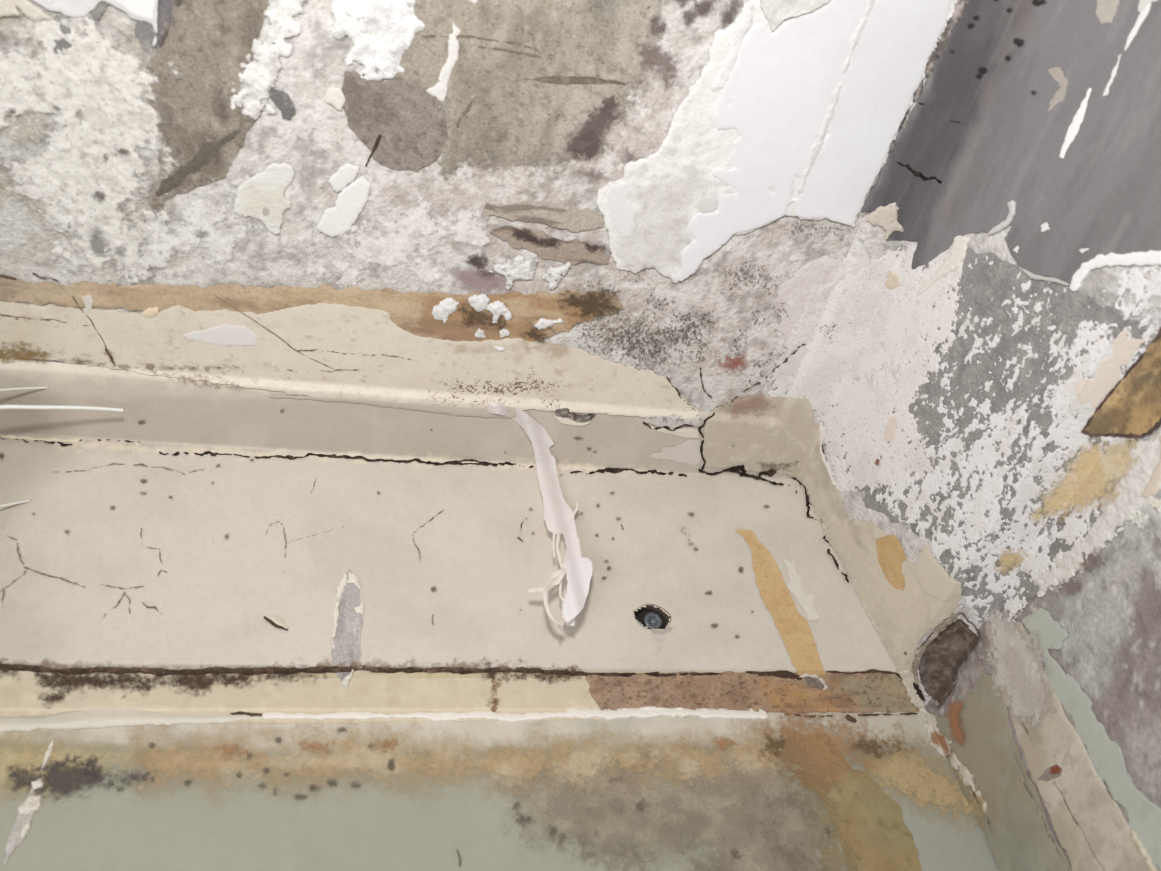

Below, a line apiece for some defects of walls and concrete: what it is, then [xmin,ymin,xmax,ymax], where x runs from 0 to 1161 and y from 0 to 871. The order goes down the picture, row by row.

spalling [0,0,270,212]
spalling [268,89,296,119]
spalling [317,0,666,237]
water stain [461,303,507,329]
water stain [527,327,552,342]
water stain [561,257,788,413]
spalling [482,0,1161,710]
peeling [0,295,703,633]
crack [0,344,849,583]
crack [0,527,167,624]
peeling [0,670,768,724]
water stain [0,724,991,871]